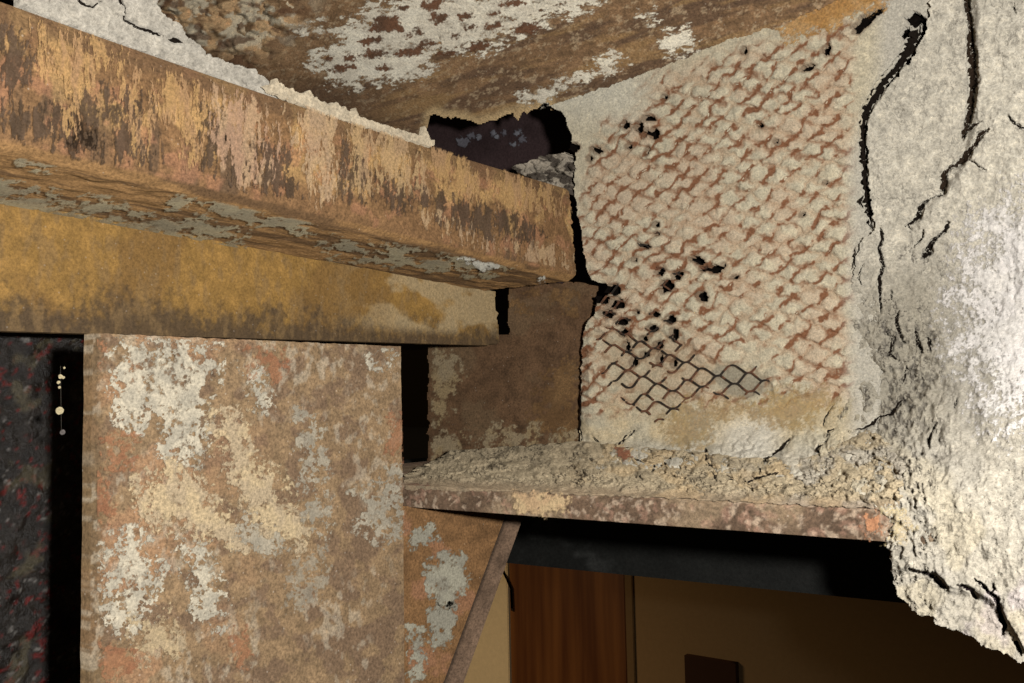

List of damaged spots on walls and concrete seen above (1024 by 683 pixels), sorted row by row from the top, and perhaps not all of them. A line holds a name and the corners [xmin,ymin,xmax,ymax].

rust [326,0,527,74]
peeling [290,0,607,93]
peeling [514,48,633,108]
peeling [634,5,701,60]
rust [0,18,574,269]
peeling [0,158,311,248]
crack [816,0,1024,455]
spalling [595,285,679,367]
rust [384,411,402,455]
rust [526,355,582,441]
rust [859,513,883,542]
crack [909,568,1020,653]